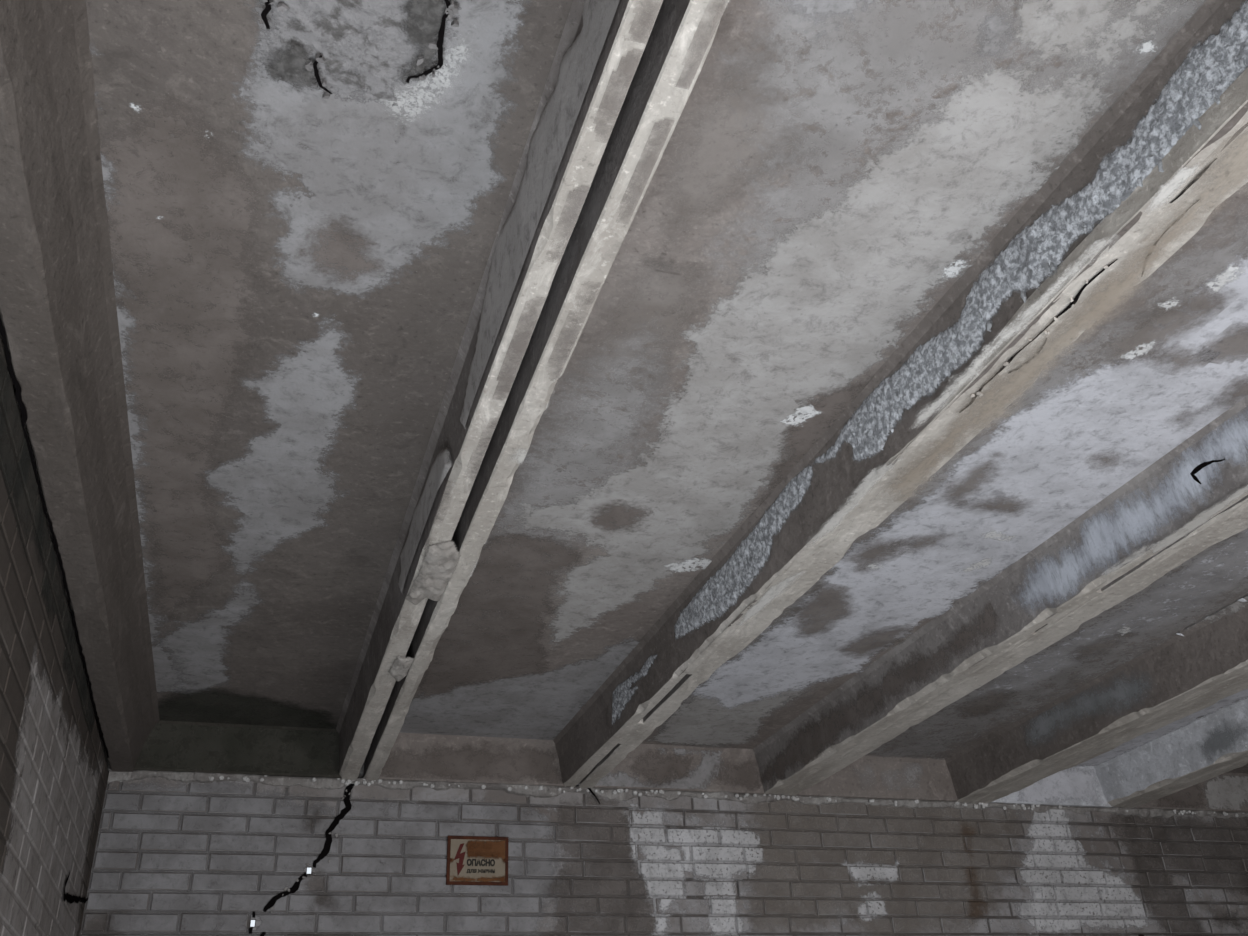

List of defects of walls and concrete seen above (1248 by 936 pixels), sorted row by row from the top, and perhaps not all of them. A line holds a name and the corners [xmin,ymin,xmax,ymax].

peeling [233,0,526,298]
crack [0,318,109,758]
damp [100,99,260,619]
damp [419,534,581,697]
damp [494,309,536,394]
peeling [494,0,1197,644]
damp [814,464,892,542]
peeling [647,225,1248,759]
damp [917,240,1111,423]
crack [1190,459,1225,484]
crack [249,775,361,936]
damp [337,604,1040,936]